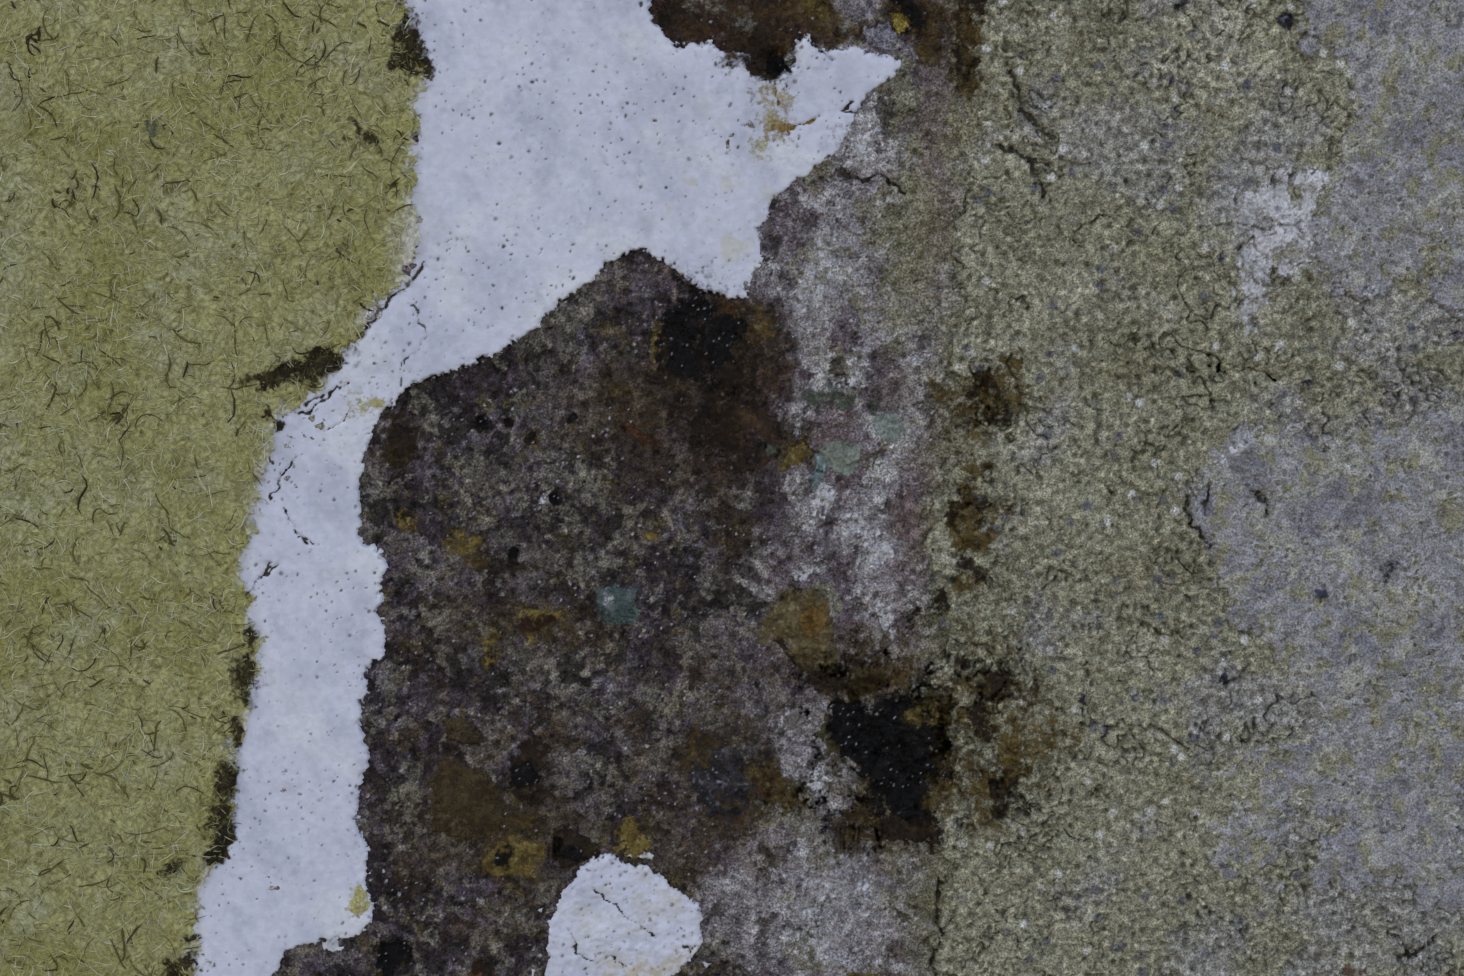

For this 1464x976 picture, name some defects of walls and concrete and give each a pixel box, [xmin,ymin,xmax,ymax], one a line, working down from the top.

spalling [648,0,961,77]
leakage [832,122,882,177]
leakage [645,187,865,459]
leakage [833,338,904,443]
spalling [272,248,815,976]
leakage [792,558,826,581]
leakage [806,455,906,578]
leakage [875,600,898,642]
leakage [679,651,887,840]
leakage [767,728,963,976]